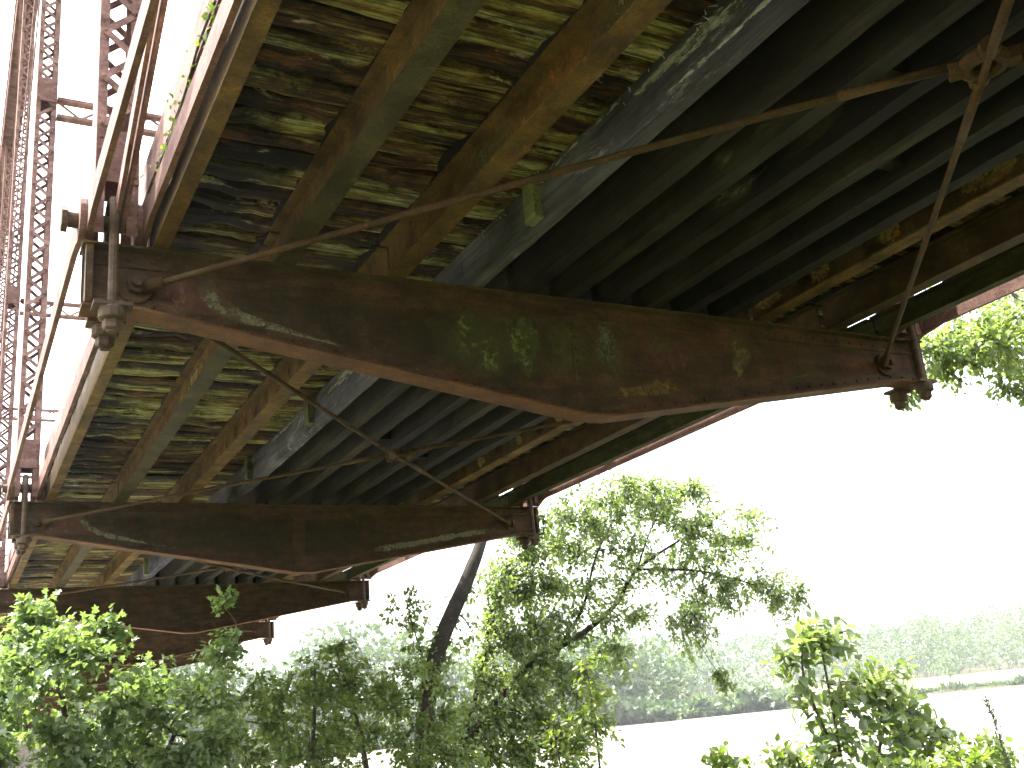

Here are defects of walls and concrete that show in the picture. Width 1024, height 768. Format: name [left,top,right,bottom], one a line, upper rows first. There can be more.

damp [200,282,357,348]